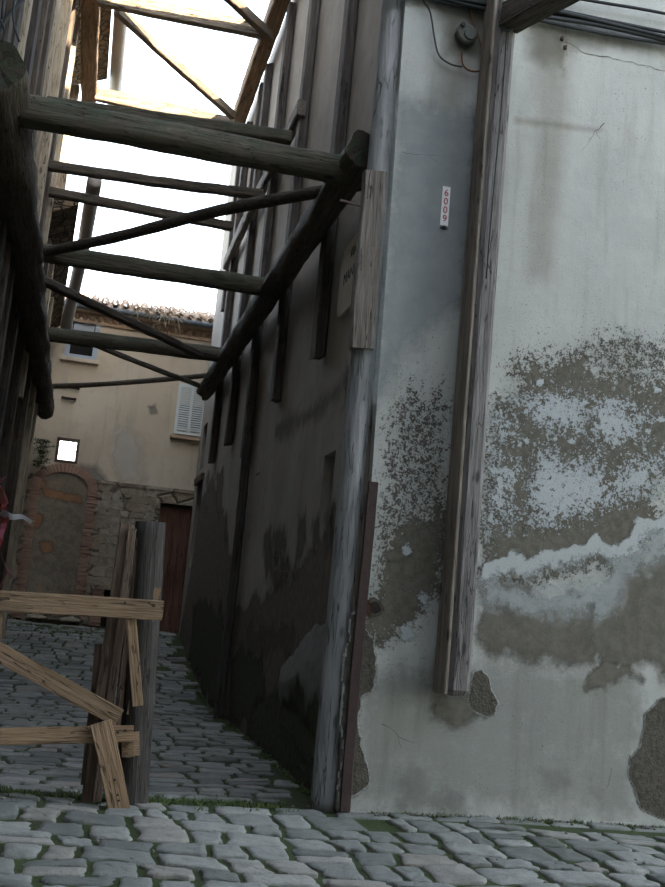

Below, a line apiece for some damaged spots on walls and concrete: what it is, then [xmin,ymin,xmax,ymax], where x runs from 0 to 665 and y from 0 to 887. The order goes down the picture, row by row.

crack [562,23,662,71]
damp [179,465,336,792]
peeling [337,365,454,808]
flaking render [467,668,500,719]
peeling [476,320,665,597]
flaking render [628,697,665,821]